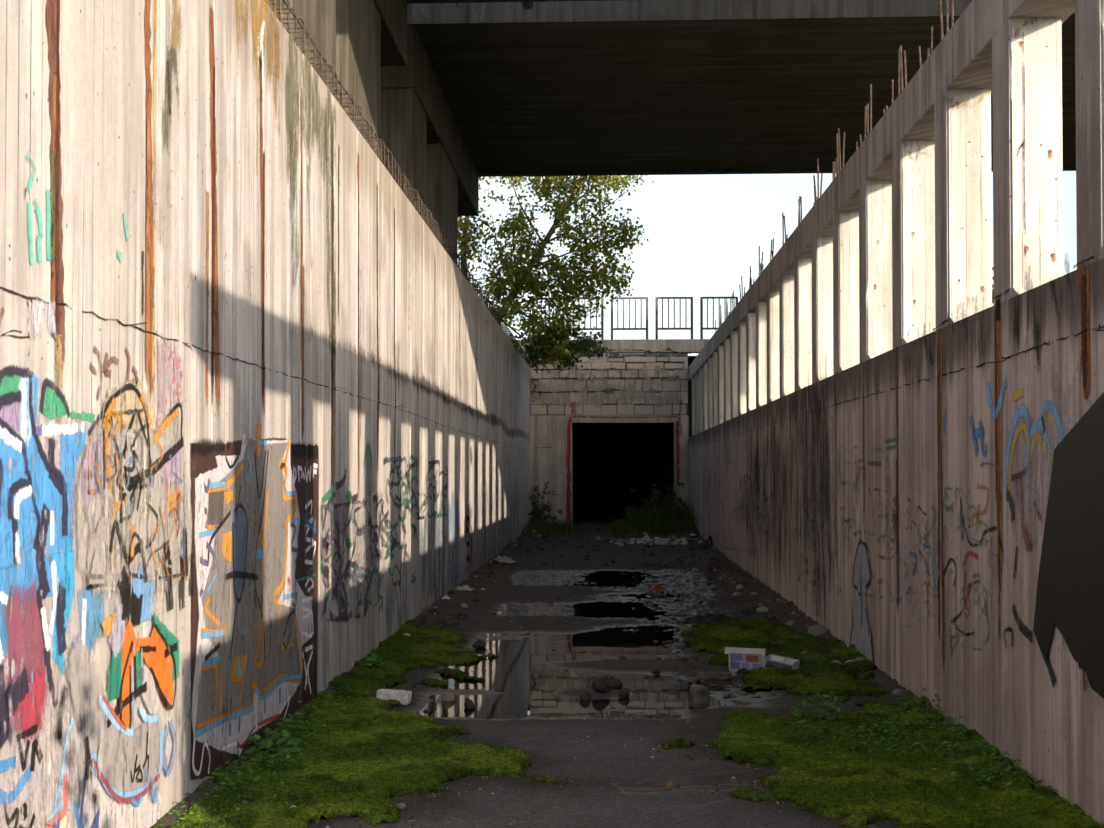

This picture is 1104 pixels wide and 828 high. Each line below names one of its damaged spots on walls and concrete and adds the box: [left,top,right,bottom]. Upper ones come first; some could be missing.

corrosion [46,0,65,399]
corrosion [141,0,157,401]
corrosion [206,8,220,412]
crack [0,286,552,448]
water stain [737,356,837,623]
crack [707,326,1104,444]
corrosion [994,299,1002,631]
corrosion [1079,260,1090,400]